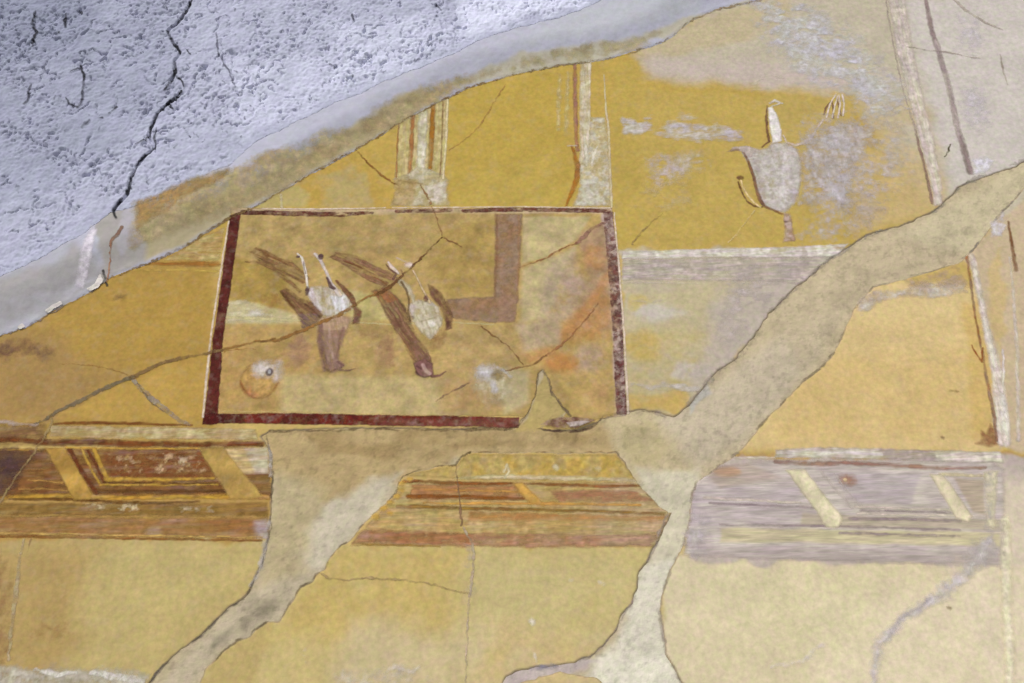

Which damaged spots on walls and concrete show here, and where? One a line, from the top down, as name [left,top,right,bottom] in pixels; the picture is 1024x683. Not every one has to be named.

crack [0,0,761,336]
crack [0,185,462,503]
crack [321,480,475,679]
crack [481,309,594,371]
spalling [150,160,1024,683]